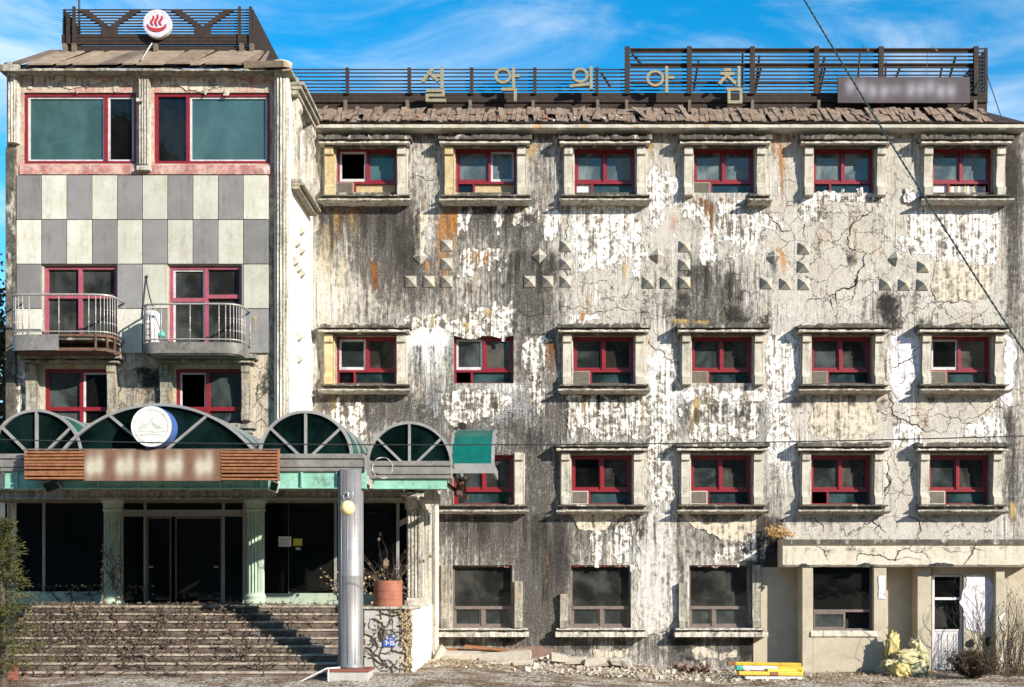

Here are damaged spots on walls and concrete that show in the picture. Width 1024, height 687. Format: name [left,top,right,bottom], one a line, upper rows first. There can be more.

rust [773,136,790,190]
rust [425,211,457,276]
peeling [404,300,516,342]
peeling [494,164,785,282]
damp [688,264,711,299]
damp [723,271,769,325]
crack [810,206,874,308]
damp [878,293,918,331]
peeling [440,386,513,430]
crack [881,348,992,433]
peeling [566,333,800,636]
crack [851,460,990,565]